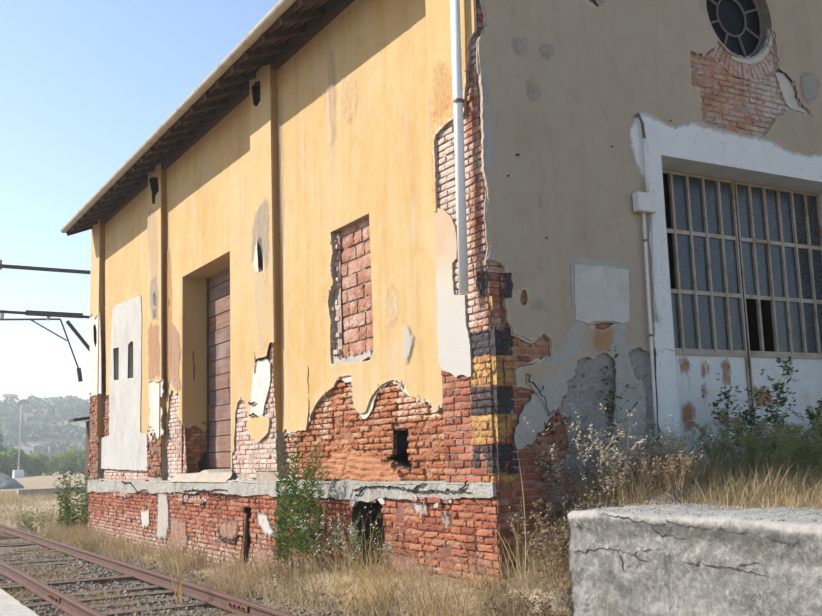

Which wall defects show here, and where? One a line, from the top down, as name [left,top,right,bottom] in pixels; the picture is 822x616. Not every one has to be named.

spalling [690,43,808,137]
spalling [230,0,581,581]
spalling [87,391,109,480]
rust [683,404,695,429]
crack [354,480,472,496]
crack [569,512,798,572]
crack [682,561,767,577]